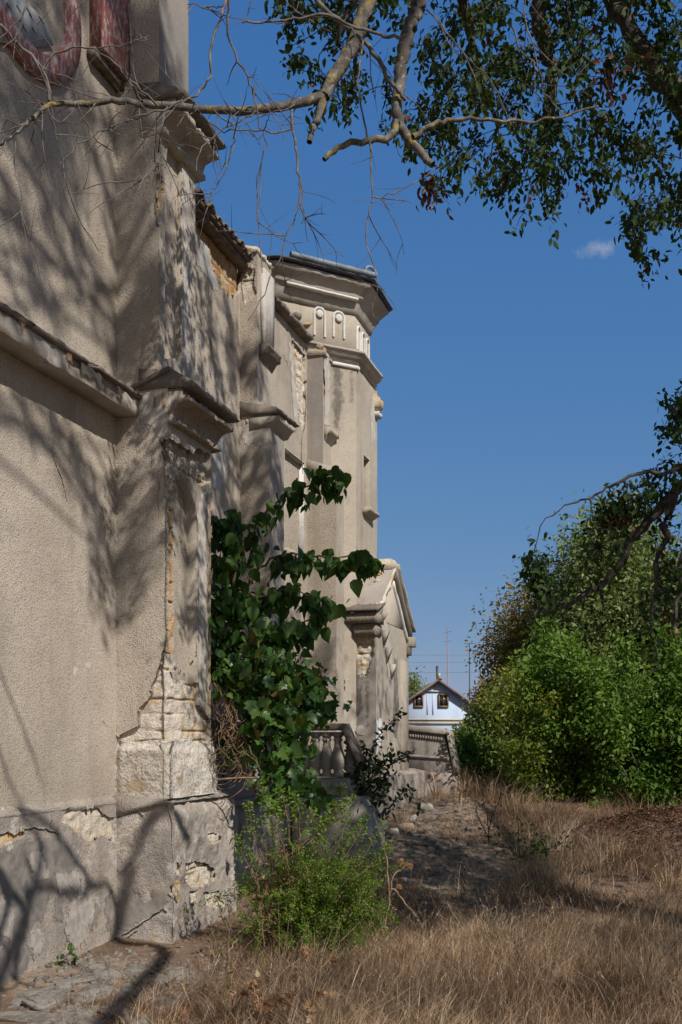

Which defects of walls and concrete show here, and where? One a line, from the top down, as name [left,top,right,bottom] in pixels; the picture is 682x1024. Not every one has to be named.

peeling [180,165,256,364]
flaking render [289,339,307,425]
flaking render [116,435,228,743]
flaking render [357,607,392,682]
flaking render [62,805,113,841]
flaking render [207,833,222,844]
flaking render [168,858,223,910]
crack [122,907,168,938]